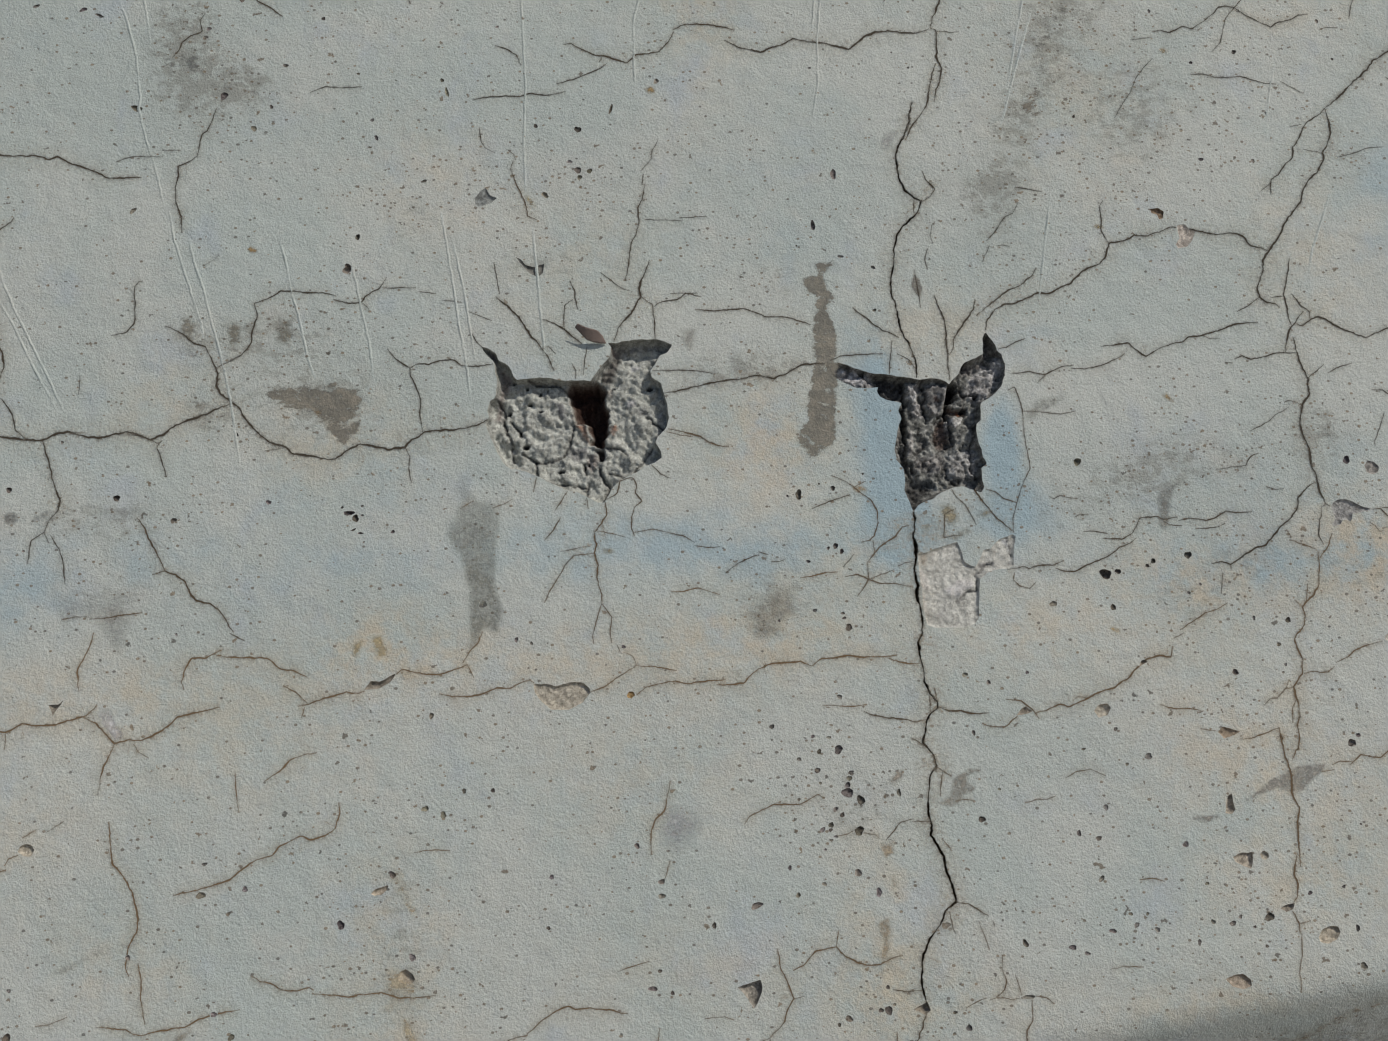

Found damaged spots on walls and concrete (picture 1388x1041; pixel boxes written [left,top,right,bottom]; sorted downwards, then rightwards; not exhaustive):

spalling [482,324,672,503]